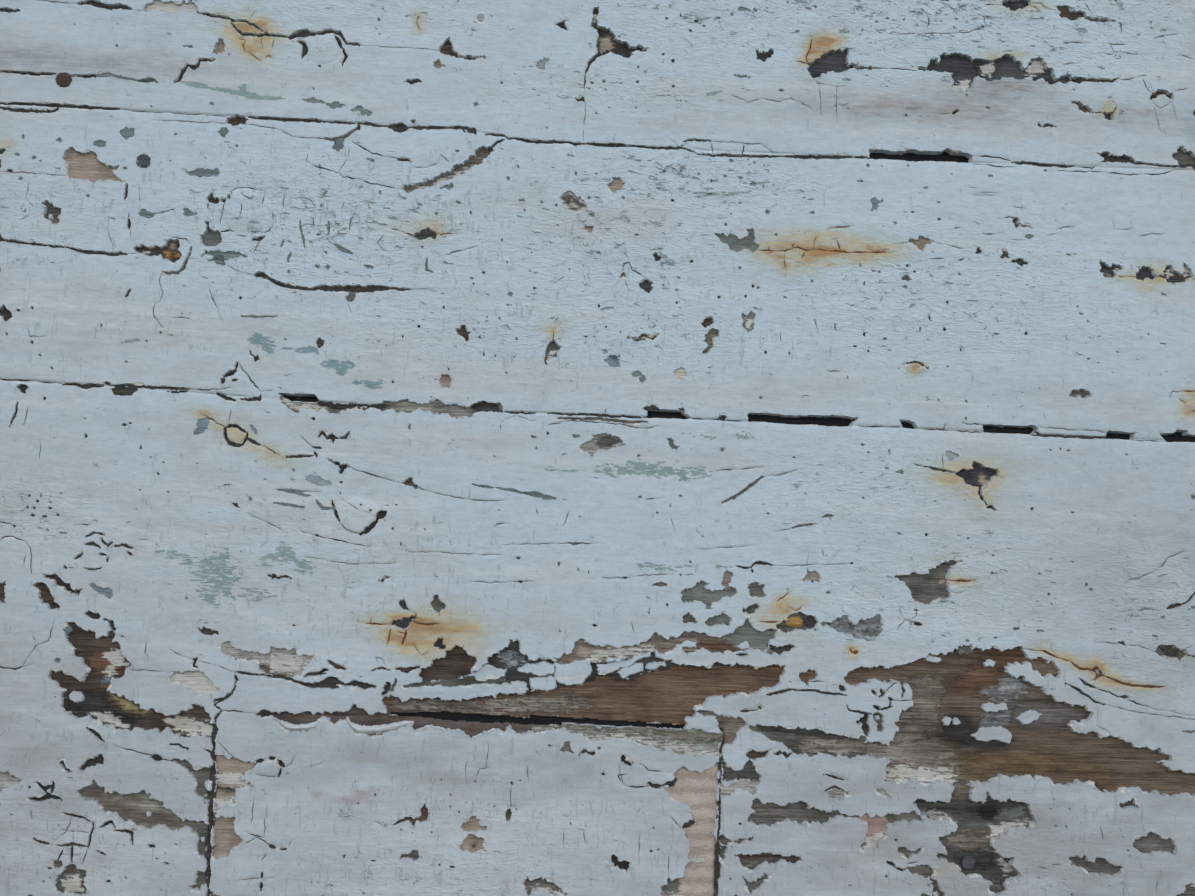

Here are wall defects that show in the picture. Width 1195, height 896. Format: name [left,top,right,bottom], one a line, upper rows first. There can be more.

rust [797,35,843,65]
peeling [918,55,1079,96]
crack [0,184,175,256]
crack [207,142,479,311]
rust [757,226,892,270]
peeling [199,627,313,678]
crack [135,646,506,712]
rust [357,610,480,655]
rust [1024,648,1165,690]
peeling [269,561,1195,896]
crack [87,727,323,891]
peeling [48,860,87,895]